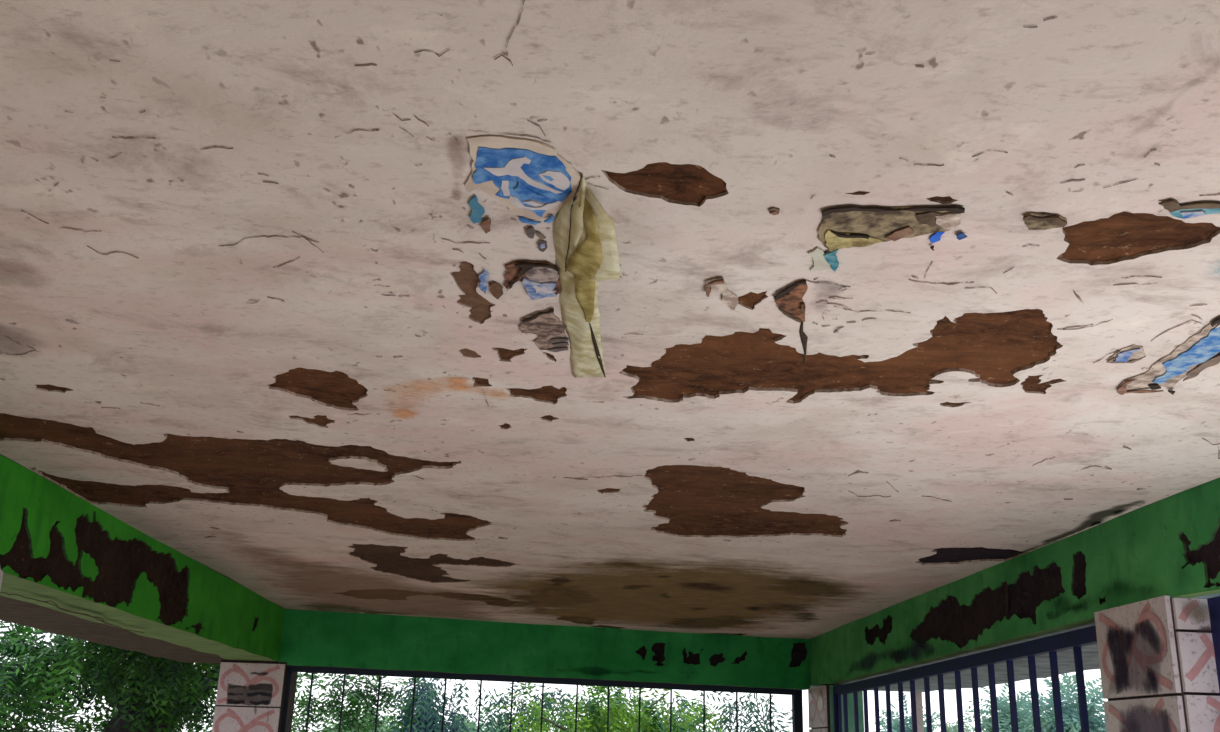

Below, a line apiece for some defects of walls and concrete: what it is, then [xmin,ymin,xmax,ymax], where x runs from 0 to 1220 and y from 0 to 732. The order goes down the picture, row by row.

flaking render [601,162,729,207]
flaking render [1057,210,1220,266]
flaking render [450,173,1066,422]
flaking render [35,384,73,393]
flaking render [267,367,368,428]
flaking render [0,413,524,634]
flaking render [642,465,848,538]
flaking render [1178,518,1220,588]
damp [258,552,854,630]
flaking render [910,547,1106,649]
damp [1107,621,1158,692]
damp [1121,707,1171,732]